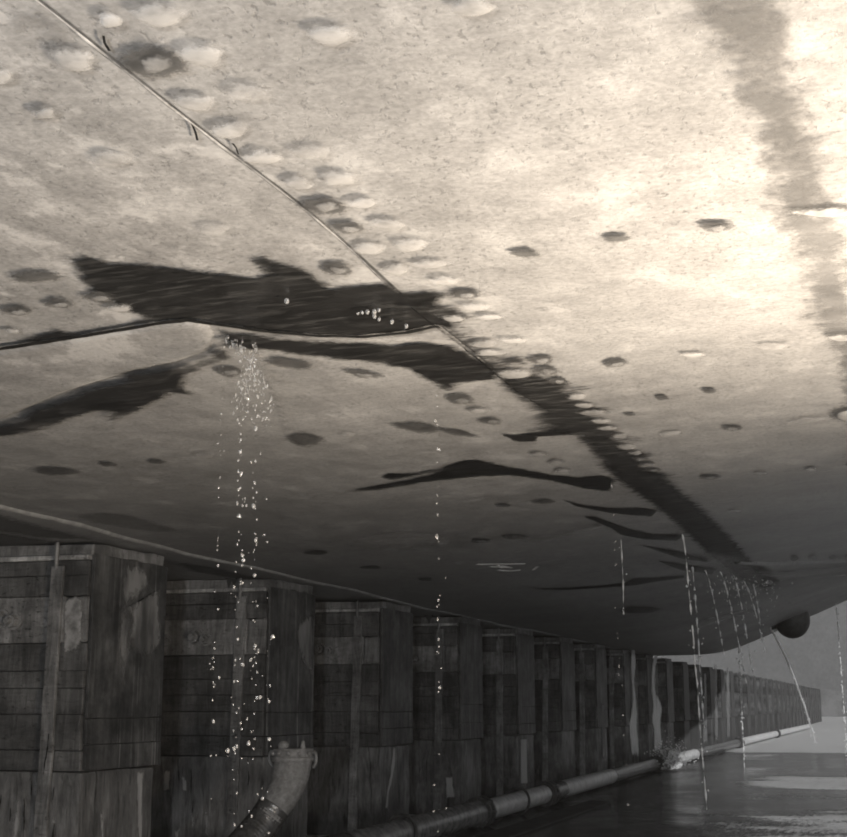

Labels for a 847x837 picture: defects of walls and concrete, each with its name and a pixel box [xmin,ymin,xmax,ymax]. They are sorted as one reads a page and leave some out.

crack [0,307,550,418]
damp [0,255,771,810]